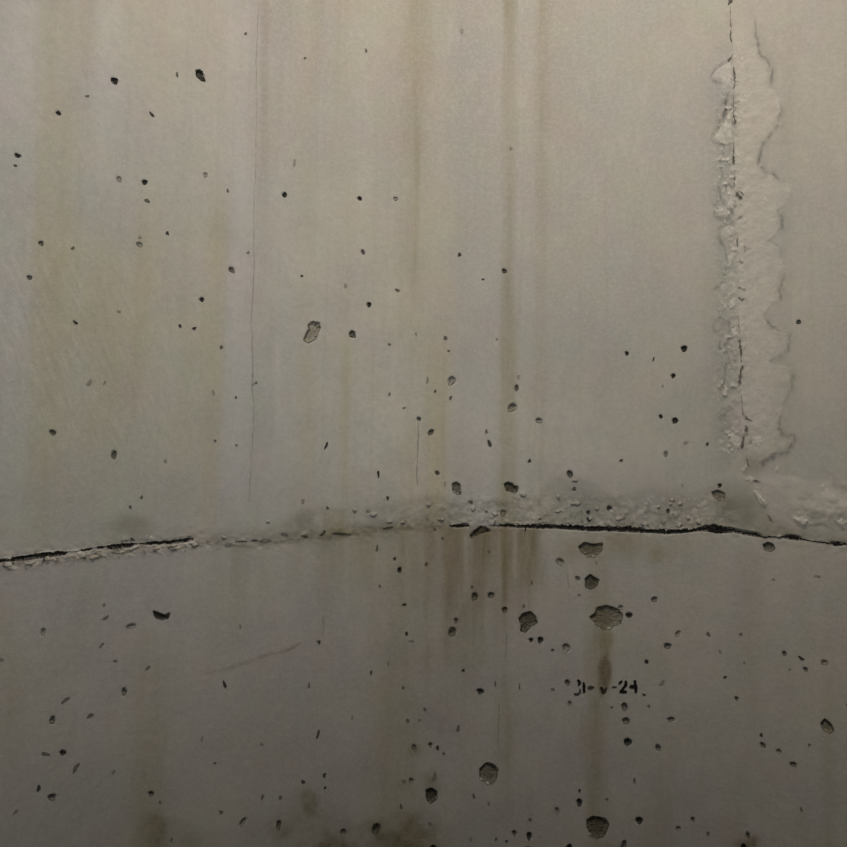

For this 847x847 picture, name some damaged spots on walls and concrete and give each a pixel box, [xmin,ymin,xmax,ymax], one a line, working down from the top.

crack [728,0,751,263]
crack [737,287,760,482]
crack [0,538,194,565]
crack [224,530,351,546]
water stain [485,507,702,531]
crack [493,514,847,546]